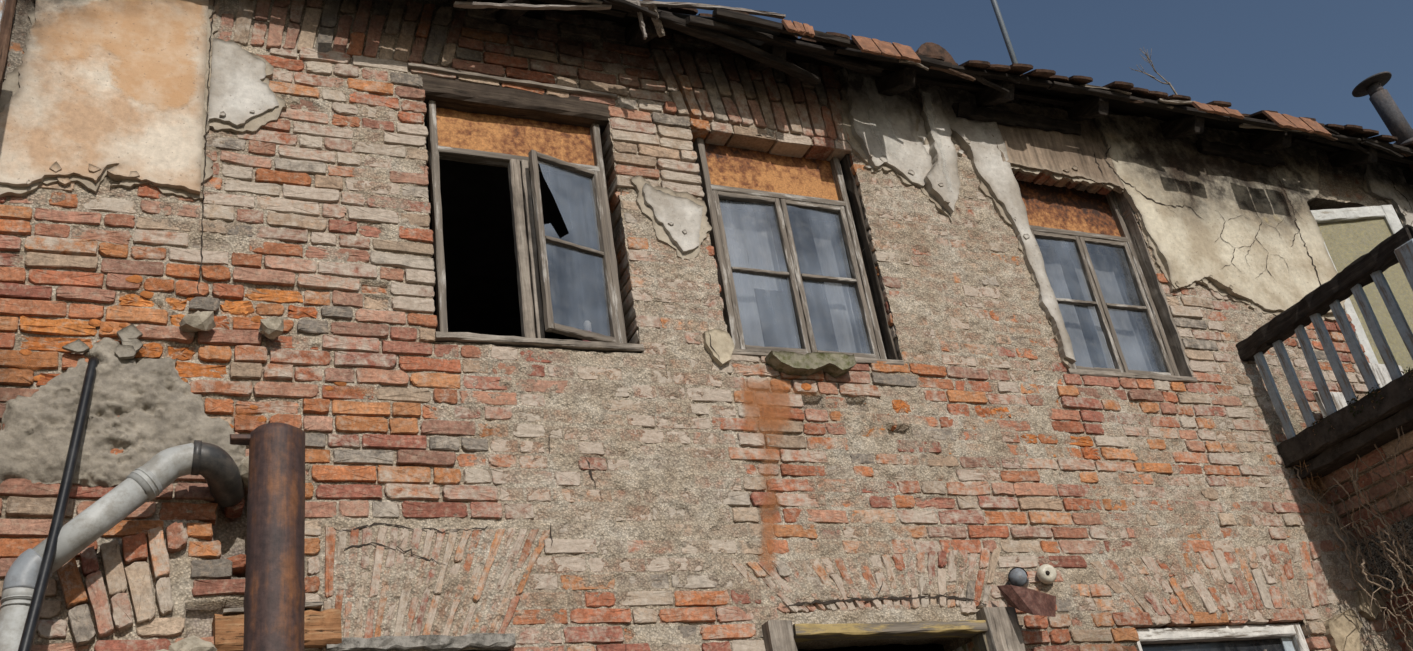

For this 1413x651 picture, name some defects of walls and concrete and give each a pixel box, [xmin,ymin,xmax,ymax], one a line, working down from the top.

peeling [0,0,287,201]
peeling [630,175,712,261]
peeling [837,68,1338,369]
crack [1092,135,1321,285]
peeling [62,339,90,354]
peeling [88,319,143,360]
peeling [1321,299,1346,322]